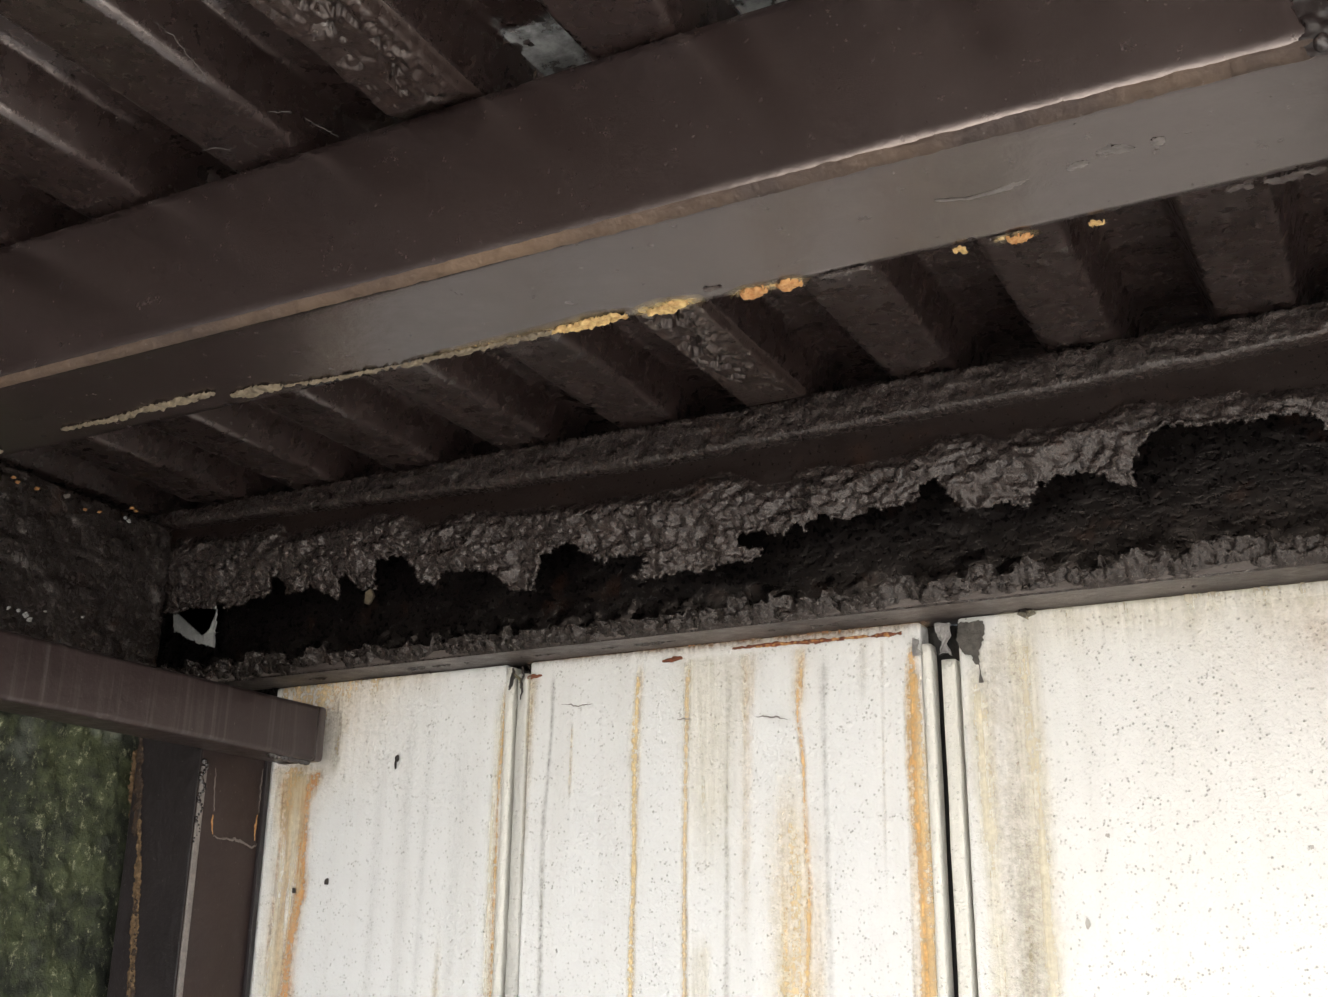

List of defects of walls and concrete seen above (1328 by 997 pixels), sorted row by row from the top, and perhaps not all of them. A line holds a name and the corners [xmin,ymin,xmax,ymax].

peeling [60,313,629,431]
peeling [173,606,218,648]
rust [653,643,713,663]
rust [732,622,909,650]
rust [796,668,805,818]
rust [126,737,144,997]
rust [267,768,320,997]
rust [783,879,811,997]
rust [907,652,936,997]